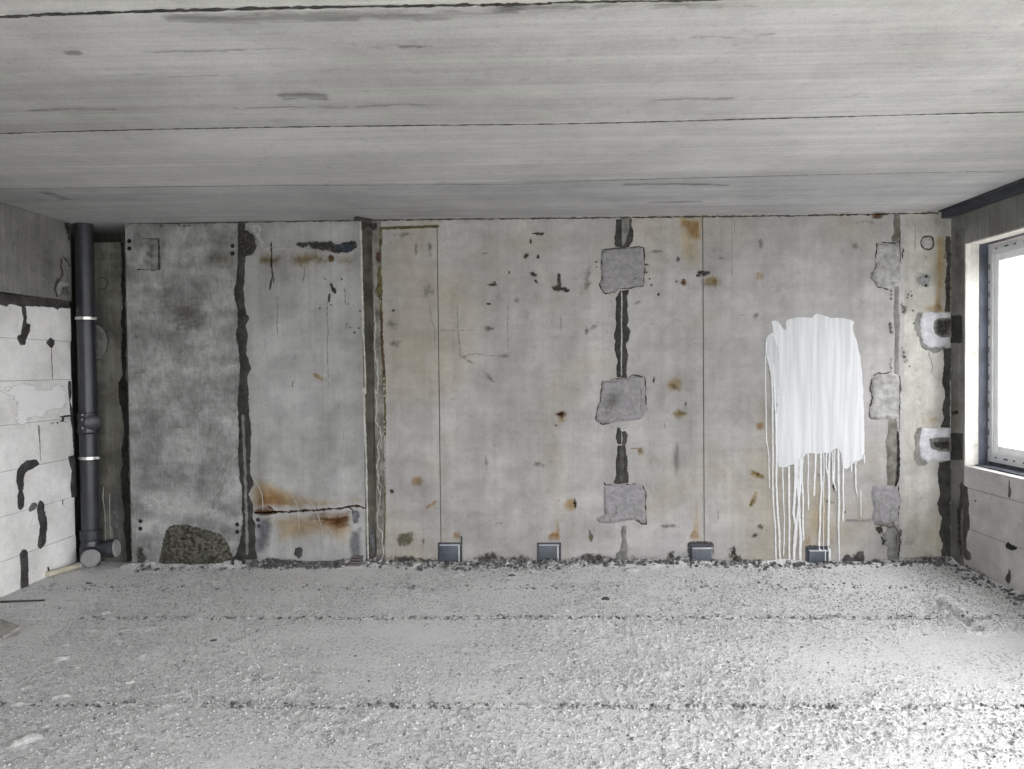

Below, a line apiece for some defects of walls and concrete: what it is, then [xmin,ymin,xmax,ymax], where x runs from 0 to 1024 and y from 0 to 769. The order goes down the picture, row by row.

spalling [337,243,354,253]
crack [254,288,384,558]